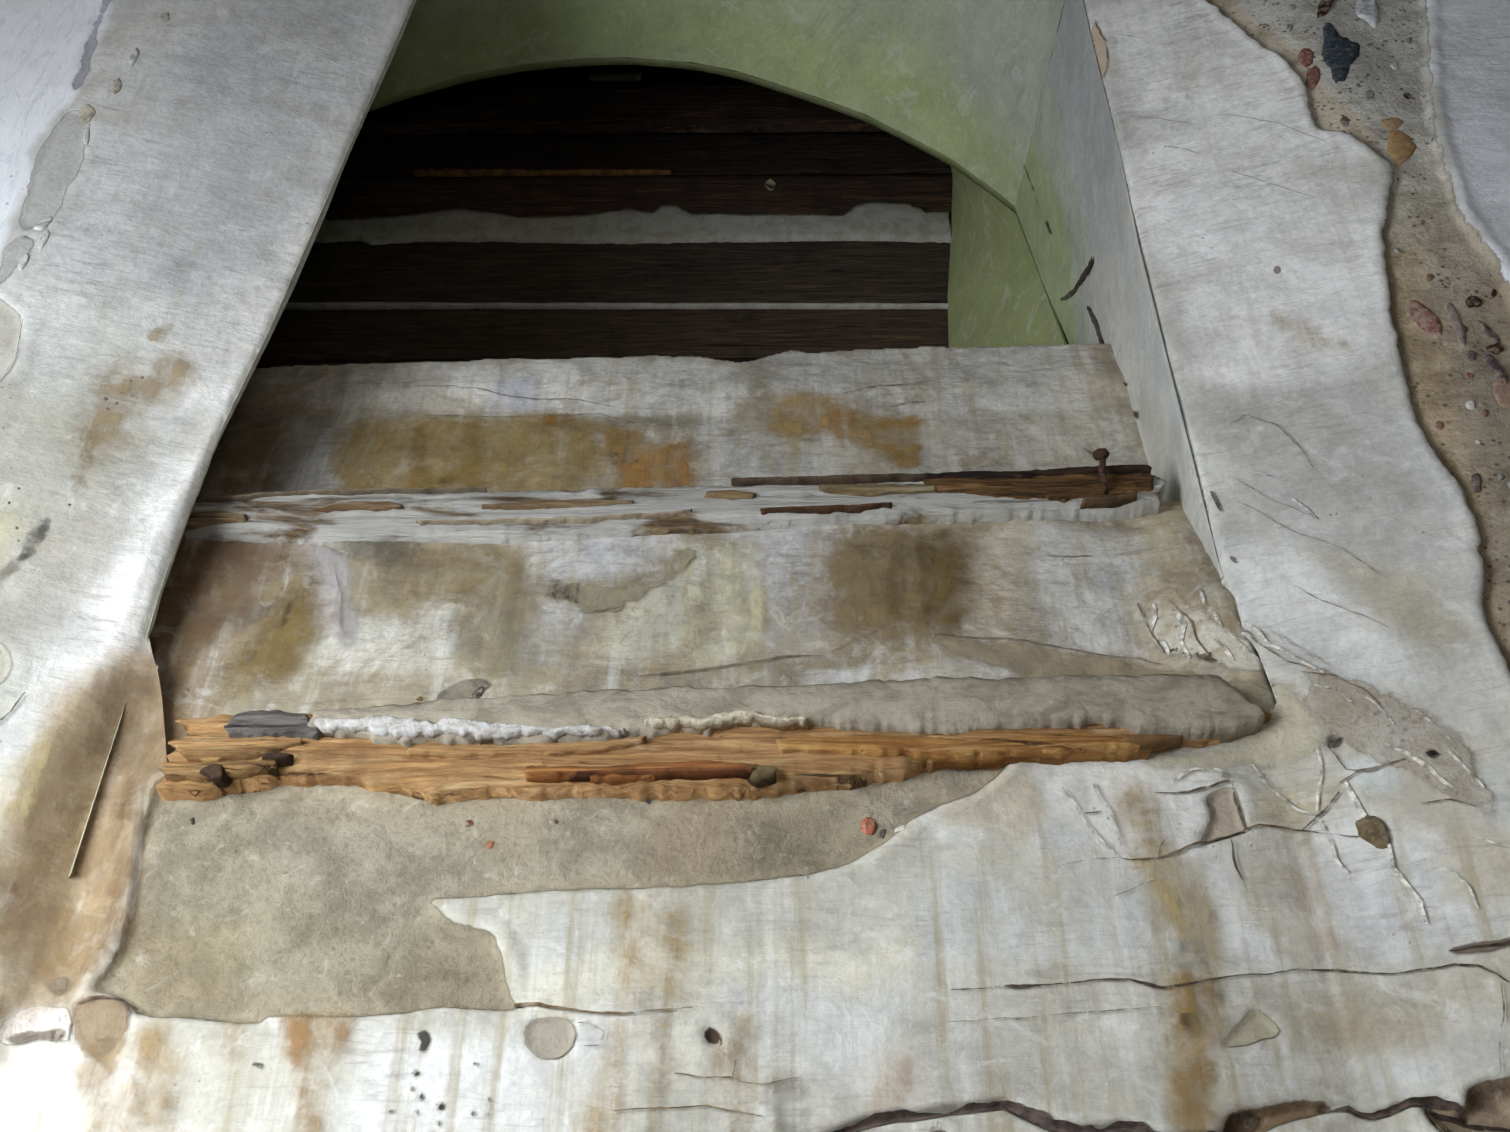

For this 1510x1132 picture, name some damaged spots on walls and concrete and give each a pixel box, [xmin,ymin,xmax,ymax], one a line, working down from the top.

flaking render [0,104,96,380]
flaking render [1207,0,1510,670]
rust [607,430,690,488]
leakage [826,530,960,634]
flaking render [417,679,490,701]
flaking render [1137,588,1494,873]
leakage [0,659,165,980]
crack [1062,758,1405,896]
flaking render [0,765,1007,1073]
crack [949,938,1510,1075]
crack [833,1100,1158,1132]
crack [1322,1096,1466,1124]